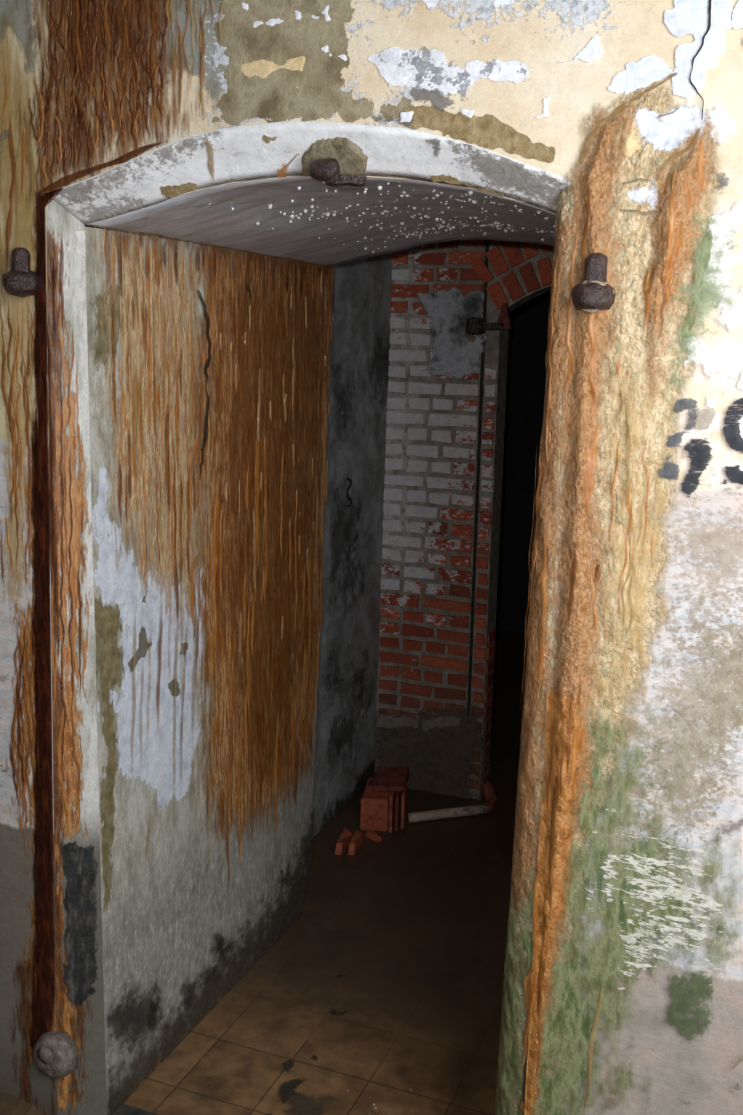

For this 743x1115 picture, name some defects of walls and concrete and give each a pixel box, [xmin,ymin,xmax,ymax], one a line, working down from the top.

spalling [160,182,197,198]
peeling [158,0,619,163]
spalling [431,173,504,197]
crack [580,0,711,215]
peeling [705,105,736,145]
water stain [95,285,121,363]
water stain [368,337,390,405]
peeling [92,466,206,810]
rust [0,0,334,1115]
rust [511,103,715,1115]
water stain [61,596,125,1006]
water stain [108,655,489,1115]